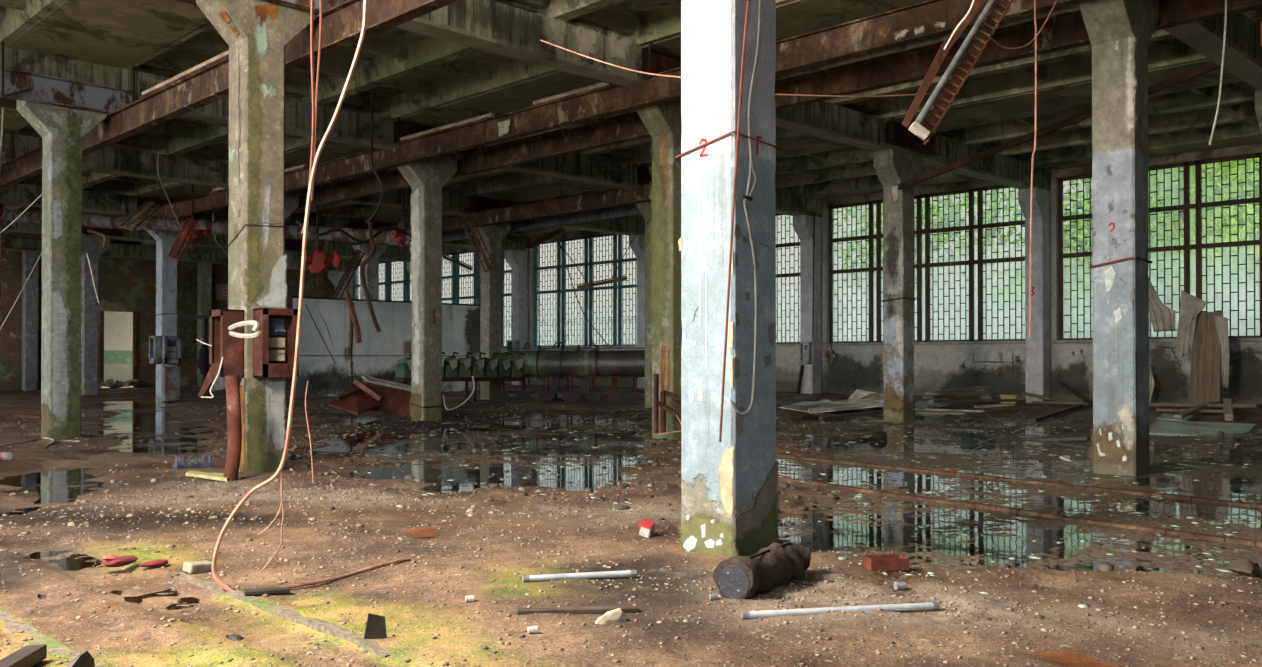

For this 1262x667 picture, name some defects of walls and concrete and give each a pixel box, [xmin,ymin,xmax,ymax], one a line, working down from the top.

peeling [720,225,748,274]
peeling [764,323,777,366]
damp [824,351,904,412]
damp [939,363,1025,397]
damp [1051,361,1089,395]
damp [1228,347,1262,400]
peeling [1096,424,1139,461]
spalling [683,407,778,556]